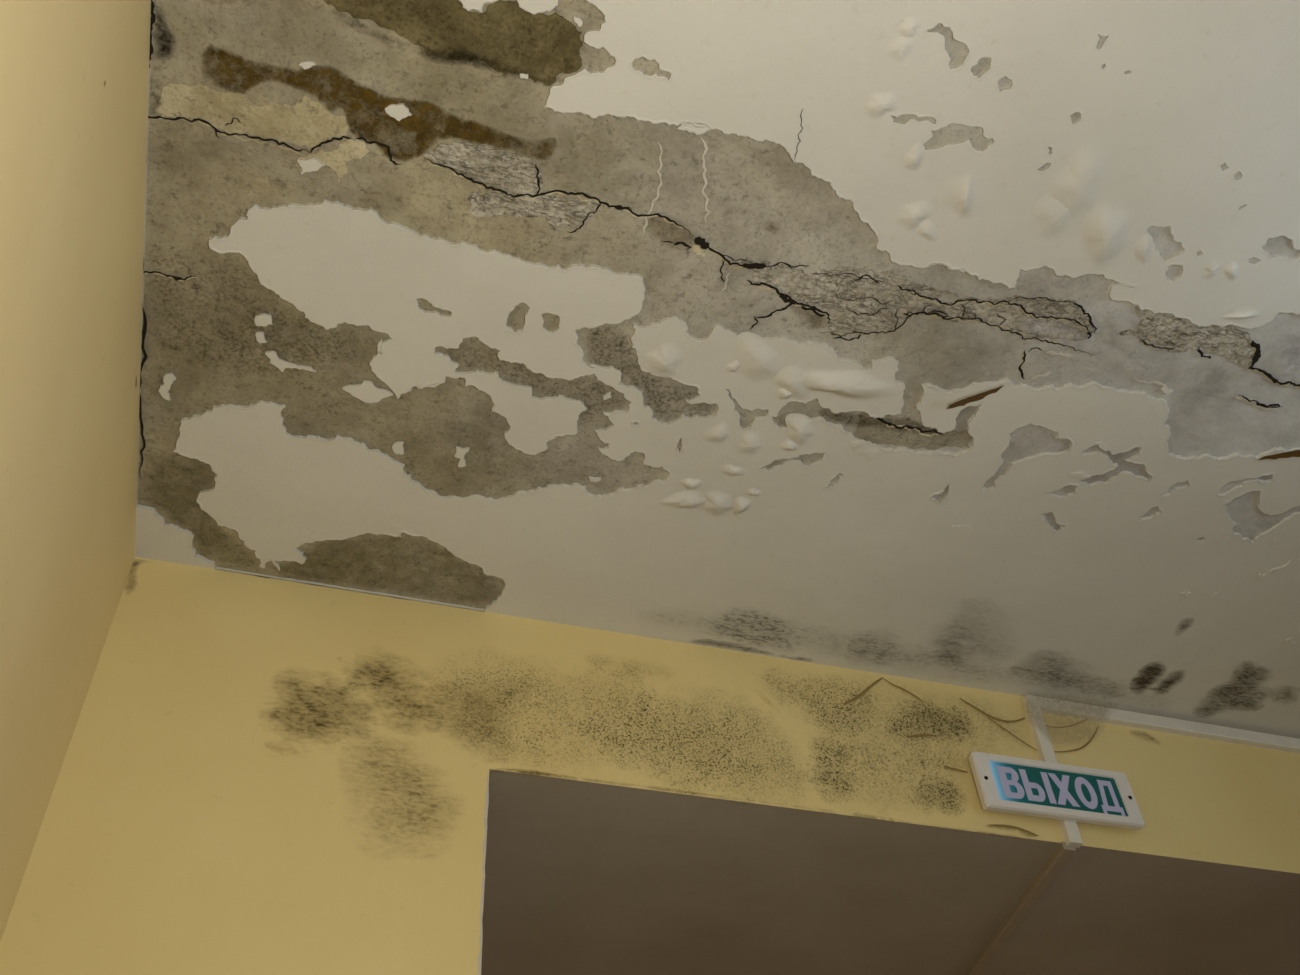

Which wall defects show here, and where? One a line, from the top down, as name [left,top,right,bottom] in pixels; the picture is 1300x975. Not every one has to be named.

water stain [204,48,553,160]
crack [148,113,1097,379]
peeling [136,0,1300,612]
crack [1141,339,1211,359]
crack [1236,340,1300,410]
water stain [274,683,343,731]
water stain [490,680,799,789]
water stain [769,682,876,793]
water stain [892,707,966,737]
water stain [1132,665,1180,693]